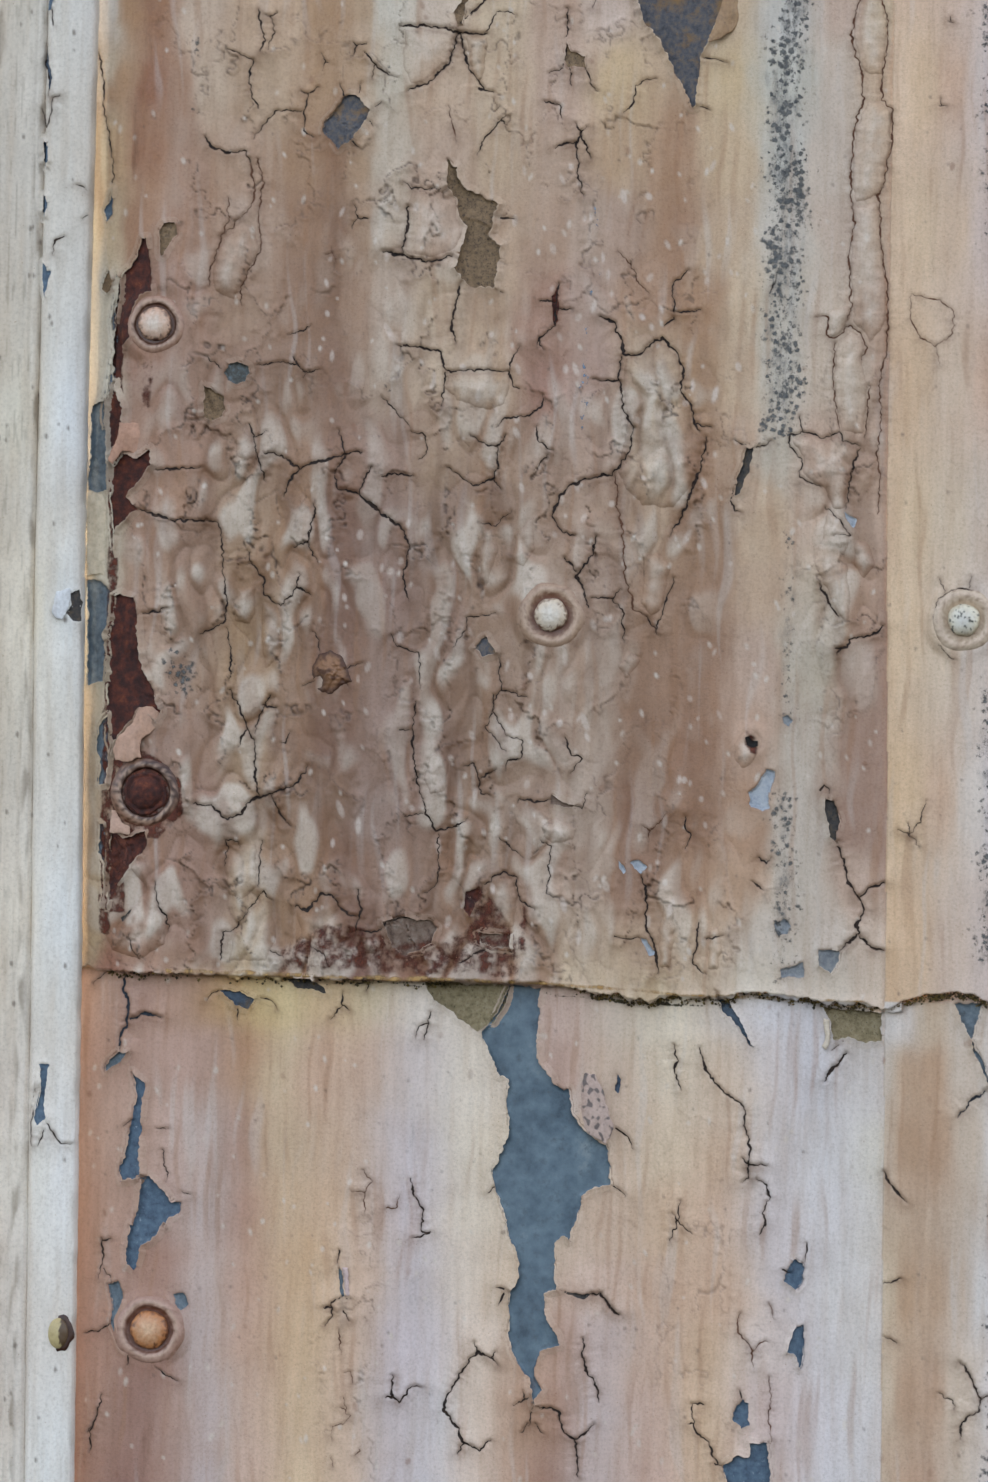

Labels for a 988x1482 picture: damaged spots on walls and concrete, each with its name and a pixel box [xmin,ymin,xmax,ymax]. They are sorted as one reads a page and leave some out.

peeling [630,0,739,114]
peeling [440,157,514,295]
mould [758,0,814,439]
crack [140,0,955,974]
rust [98,232,183,934]
rust [282,888,527,977]
mould [973,785,988,961]
peeling [100,1046,184,1356]
peeling [423,980,633,1412]
crack [673,1046,771,1235]
crack [592,1293,619,1315]
crack [385,1338,599,1477]